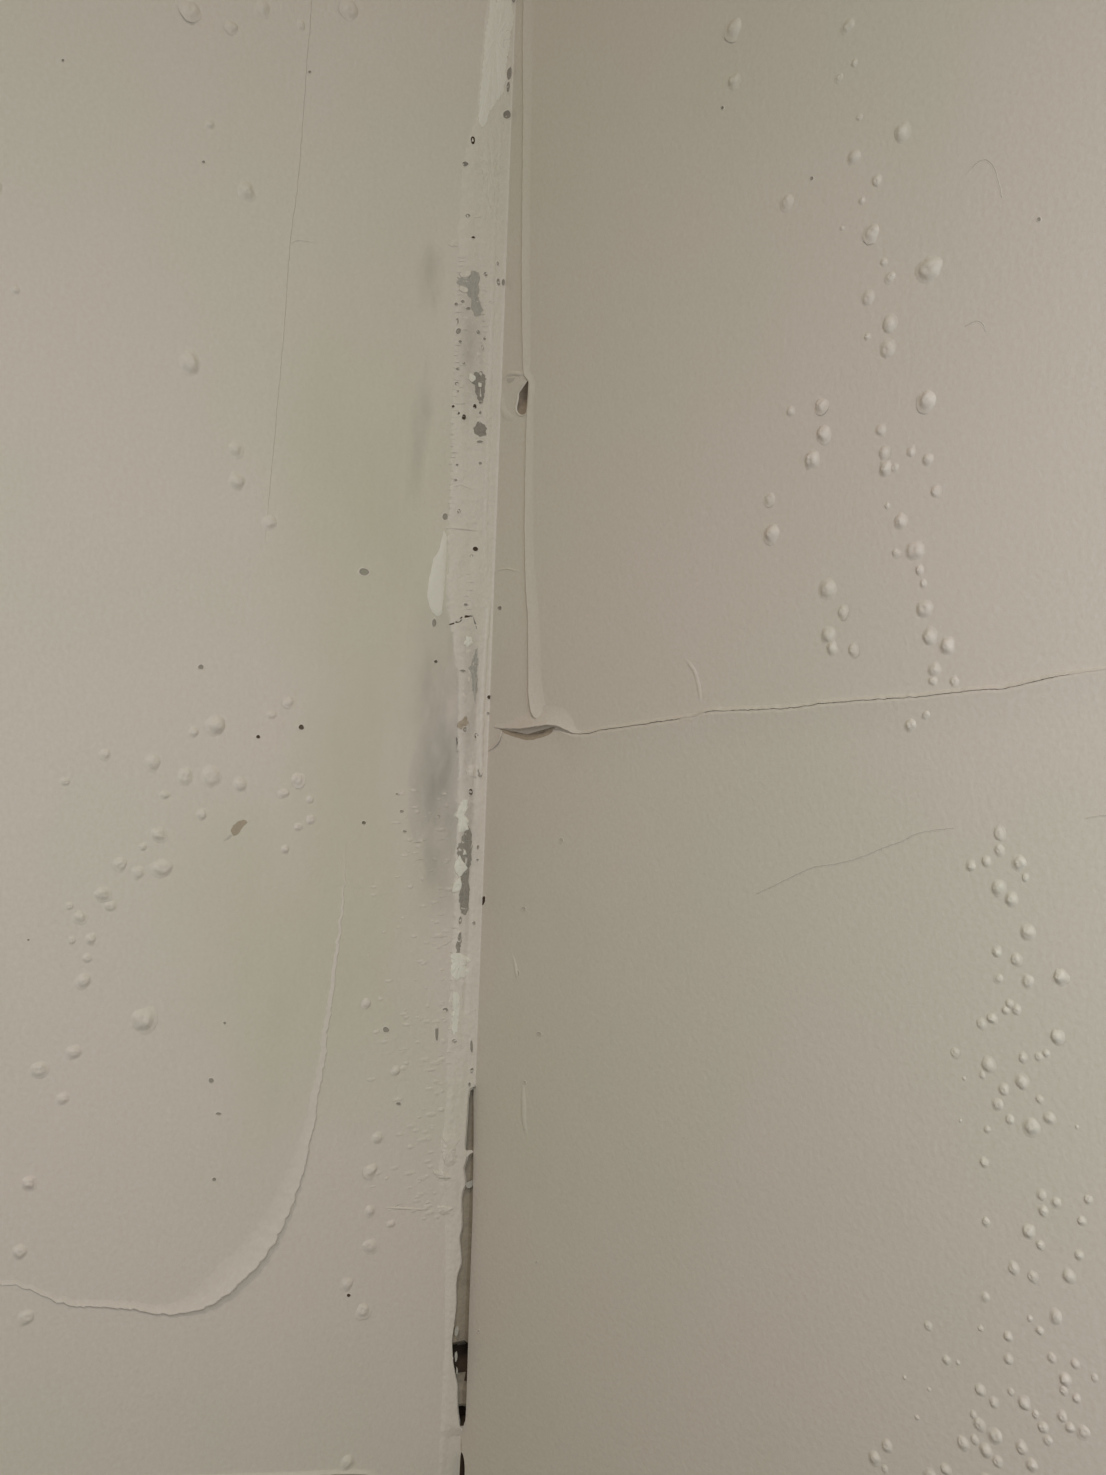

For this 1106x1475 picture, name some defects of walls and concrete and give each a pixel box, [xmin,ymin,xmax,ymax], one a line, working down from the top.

spalling [457,270,483,316]
spalling [468,371,486,403]
spalling [473,421,487,437]
peeling [427,531,447,616]
spalling [457,636,478,729]
spalling [452,800,473,915]
peeling [450,935,471,1035]
crack [452,1089,474,1475]